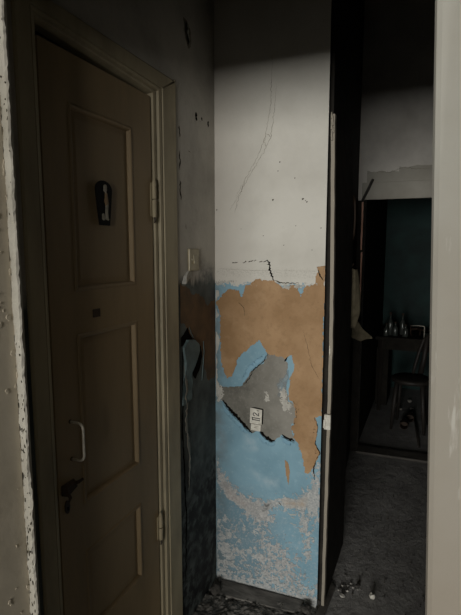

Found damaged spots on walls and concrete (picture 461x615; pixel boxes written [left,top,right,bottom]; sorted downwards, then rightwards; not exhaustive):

peeling [180,266,325,605]
crack [231,260,298,284]